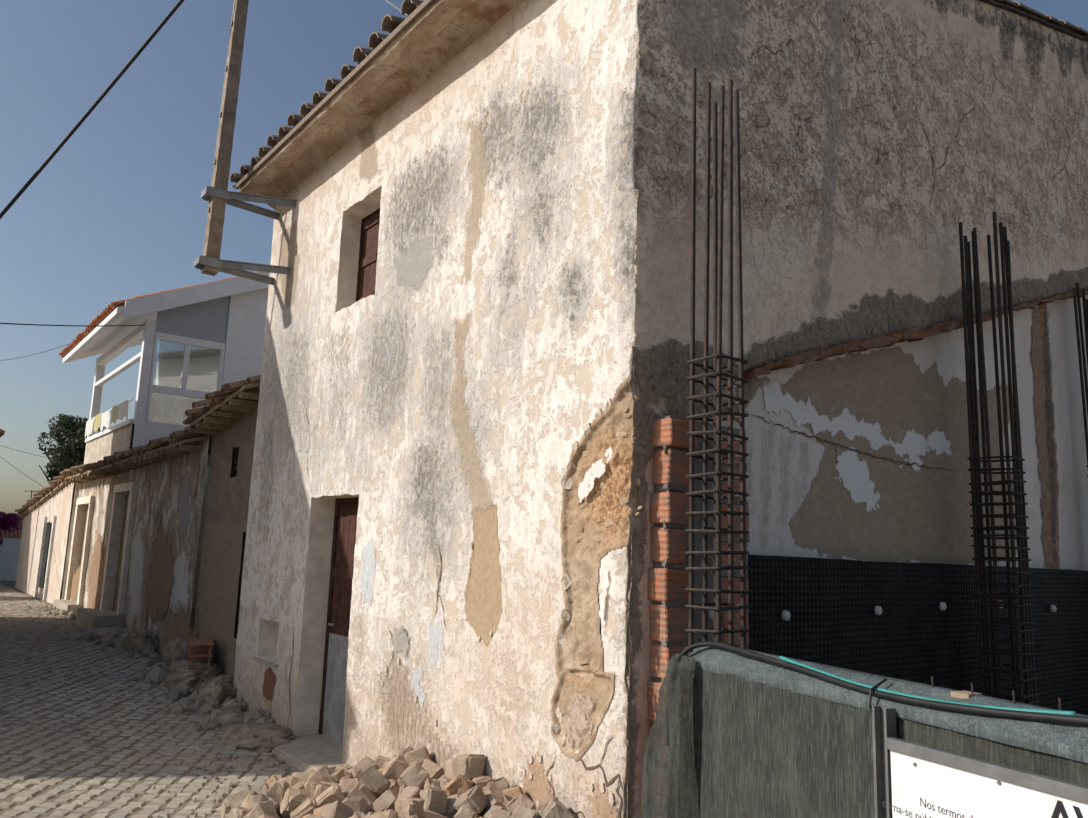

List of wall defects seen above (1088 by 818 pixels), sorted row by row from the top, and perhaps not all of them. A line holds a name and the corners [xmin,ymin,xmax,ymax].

water stain [924,0,1088,79]
water stain [461,122,487,284]
crack [744,411,957,471]
peeling [761,346,1017,565]
flaking render [145,525,176,626]
flaking render [464,505,502,646]
flaking render [551,375,643,762]